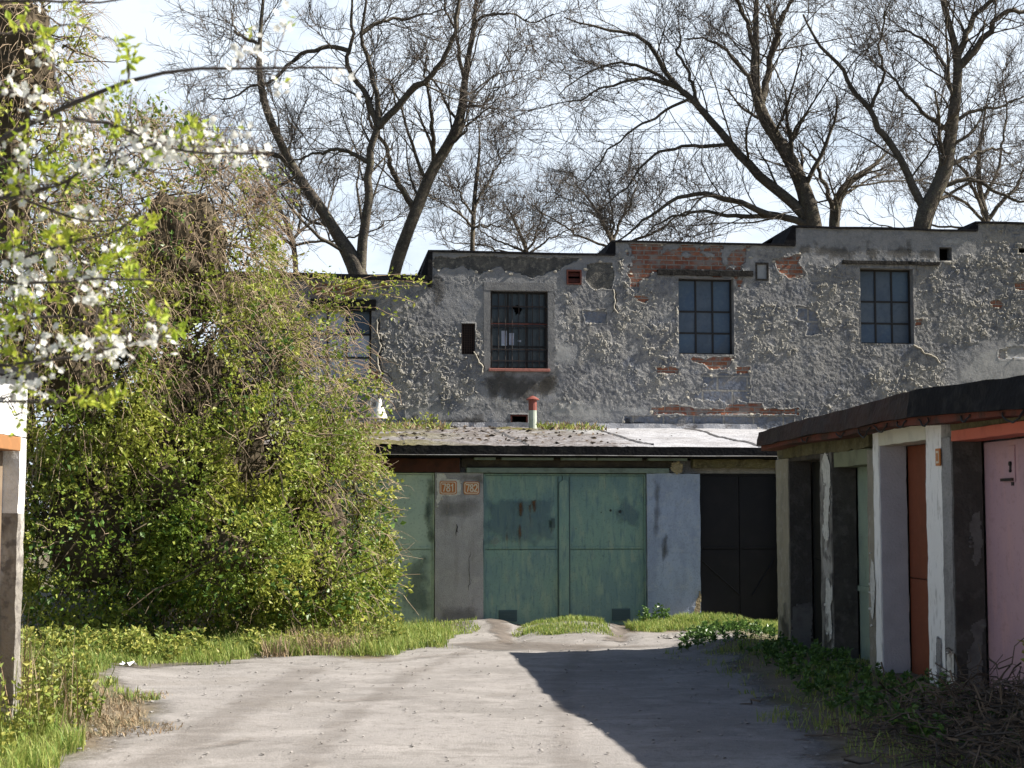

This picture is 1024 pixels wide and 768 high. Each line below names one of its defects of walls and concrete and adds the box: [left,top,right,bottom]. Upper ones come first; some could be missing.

flaking render [625,244,753,303]
flaking render [772,253,806,278]
flaking render [691,356,751,377]
flaking render [649,386,800,417]
peeling [822,453,831,550]